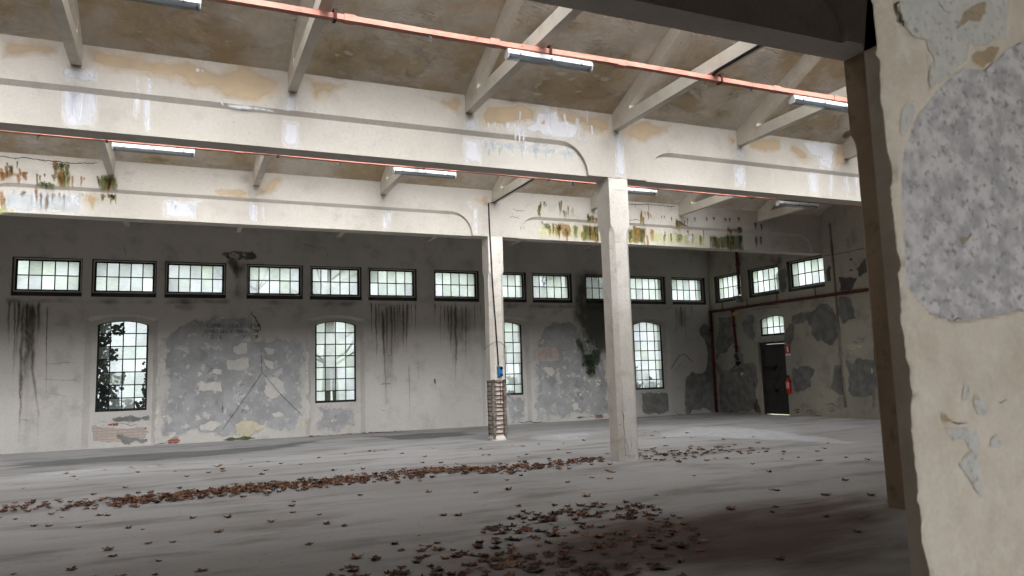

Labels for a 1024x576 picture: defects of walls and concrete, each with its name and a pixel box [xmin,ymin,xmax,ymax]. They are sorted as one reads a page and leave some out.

water stain [0,161,117,208]
water stain [64,53,273,130]
peeling [487,108,597,148]
water stain [538,201,598,241]
water stain [629,211,742,249]
spalling [895,0,1024,321]
flaking render [784,258,867,345]
flaking render [92,317,353,445]
flaking render [487,323,609,439]
flaking render [674,324,761,414]
flaking render [793,358,877,416]